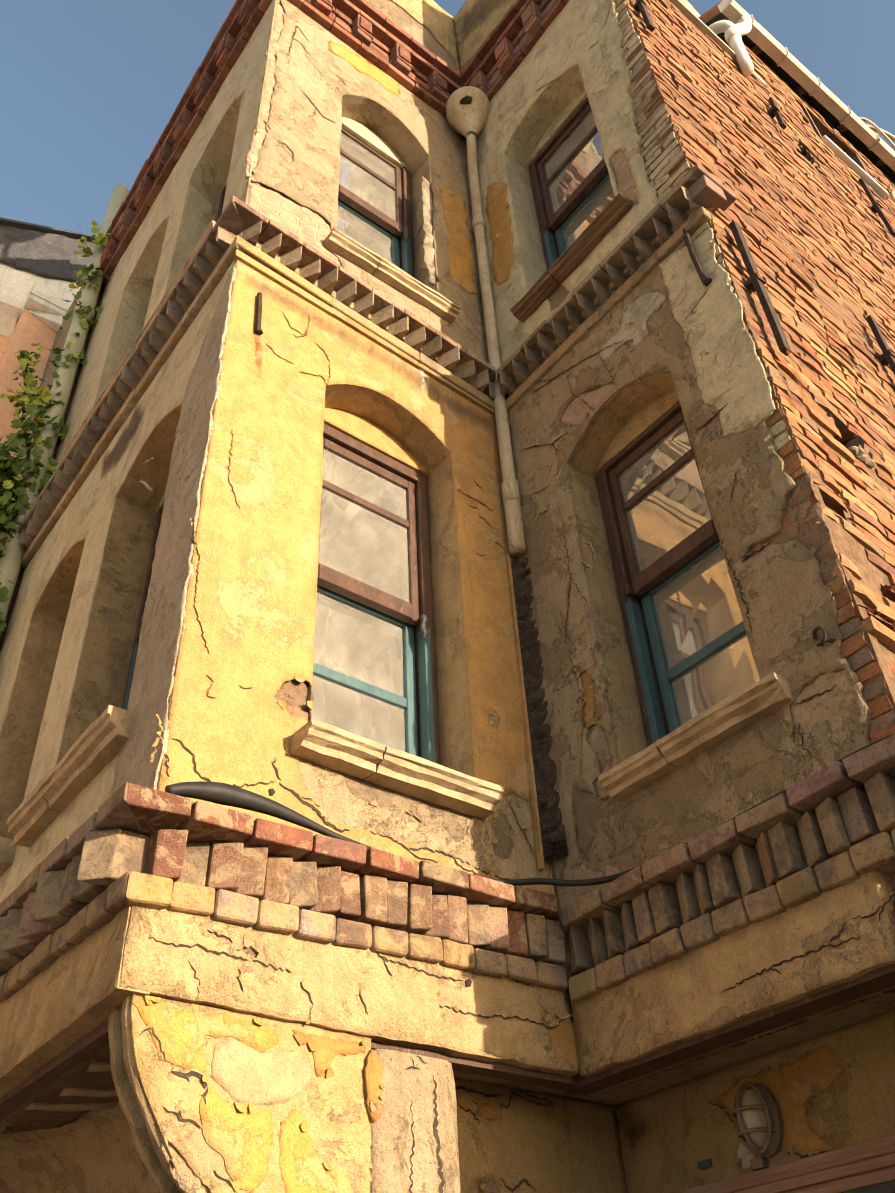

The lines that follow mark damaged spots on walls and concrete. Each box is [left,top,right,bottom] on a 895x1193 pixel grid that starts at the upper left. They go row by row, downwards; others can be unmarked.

crack [286,26,309,56]
peeling [327,41,401,96]
peeling [421,176,478,294]
crack [272,314,332,386]
peeling [597,228,776,436]
spalling [274,677,314,722]
crack [149,929,314,1024]
crack [378,953,573,1029]
crack [720,891,895,993]
peeling [2,1044,119,1134]
peeling [131,995,385,1193]
crack [405,1056,557,1193]